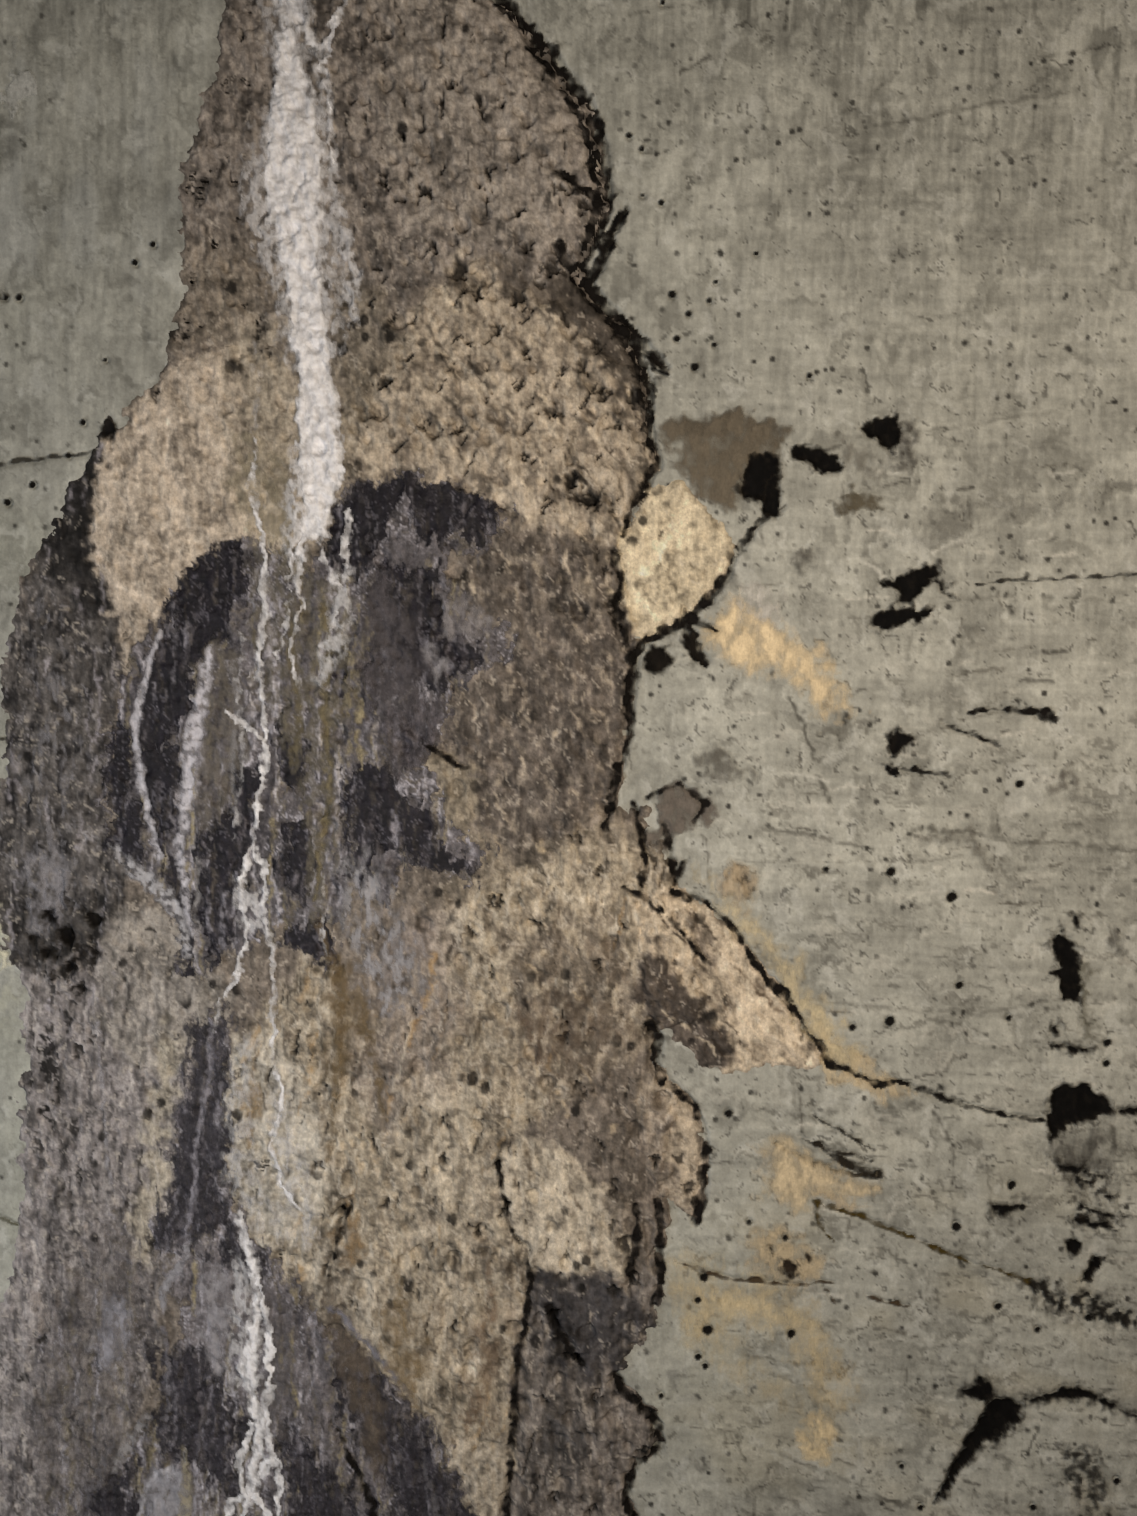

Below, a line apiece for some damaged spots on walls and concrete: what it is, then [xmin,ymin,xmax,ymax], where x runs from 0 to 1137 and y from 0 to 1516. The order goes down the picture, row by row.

spalling [602,207,627,253]
spalling [643,353,670,384]
spalling [101,418,115,438]
peeling [614,406,883,675]
crack [493,0,1058,1122]
water stain [26,0,518,1516]
crack [422,741,468,769]
peeling [645,781,717,851]
hole [29,909,101,993]
peeling [633,876,826,1074]
peeling [638,1062,709,1216]
spalling [770,1247,811,1279]